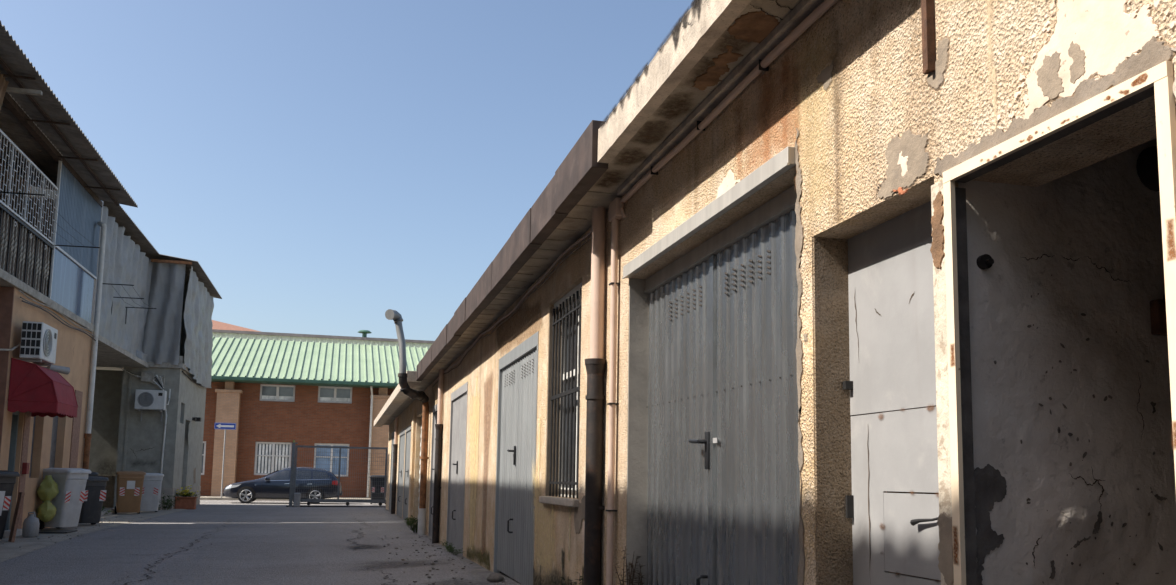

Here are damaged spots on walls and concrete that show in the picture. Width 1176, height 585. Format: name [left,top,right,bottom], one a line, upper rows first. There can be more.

leakage [658,0,701,51]
flaking render [927,36,950,91]
flaking render [997,0,1176,131]
flaking render [716,169,741,198]
flaking render [878,127,964,269]
crack [1071,466,1105,510]
spalling [974,464,1007,585]